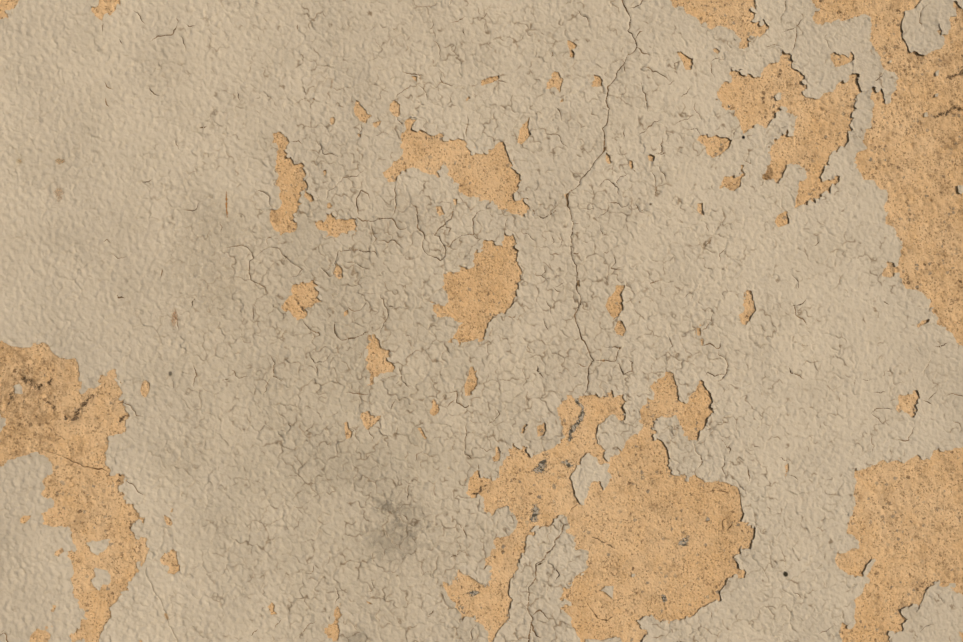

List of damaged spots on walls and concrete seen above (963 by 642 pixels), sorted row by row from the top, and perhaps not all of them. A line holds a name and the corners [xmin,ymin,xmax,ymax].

crack [131,9,195,48]
crack [220,140,483,372]
crack [396,3,487,124]
peeling [383,100,531,217]
peeling [430,229,523,347]
crack [505,0,704,394]
peeling [713,0,963,346]
peeling [0,336,150,642]
crack [447,391,507,495]
crack [527,506,575,642]
peeling [443,366,756,642]
peeling [835,446,963,642]